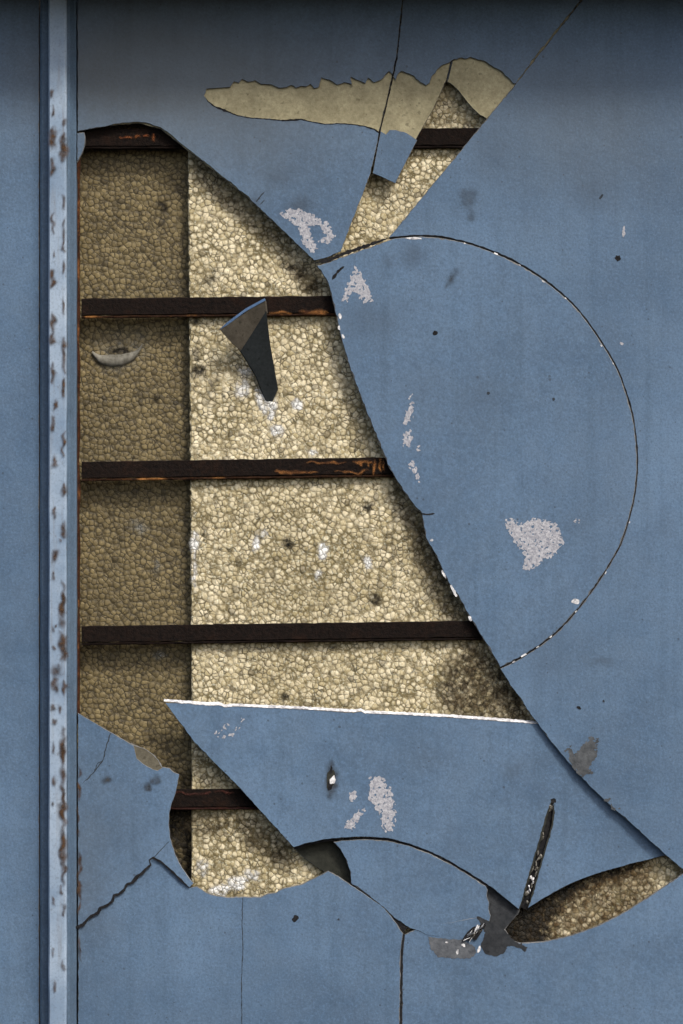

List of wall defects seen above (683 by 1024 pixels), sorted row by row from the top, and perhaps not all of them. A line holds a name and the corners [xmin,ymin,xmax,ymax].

corrosion [49,90,69,175]
peeling [94,122,336,253]
peeling [204,11,573,139]
corrosion [50,301,67,466]
crack [316,235,638,669]
corrosion [51,507,68,693]
peeling [505,518,564,570]
corrosion [51,705,82,916]
crack [76,842,188,929]
crack [238,898,246,1023]
crack [350,883,407,1024]
peeling [428,873,527,959]